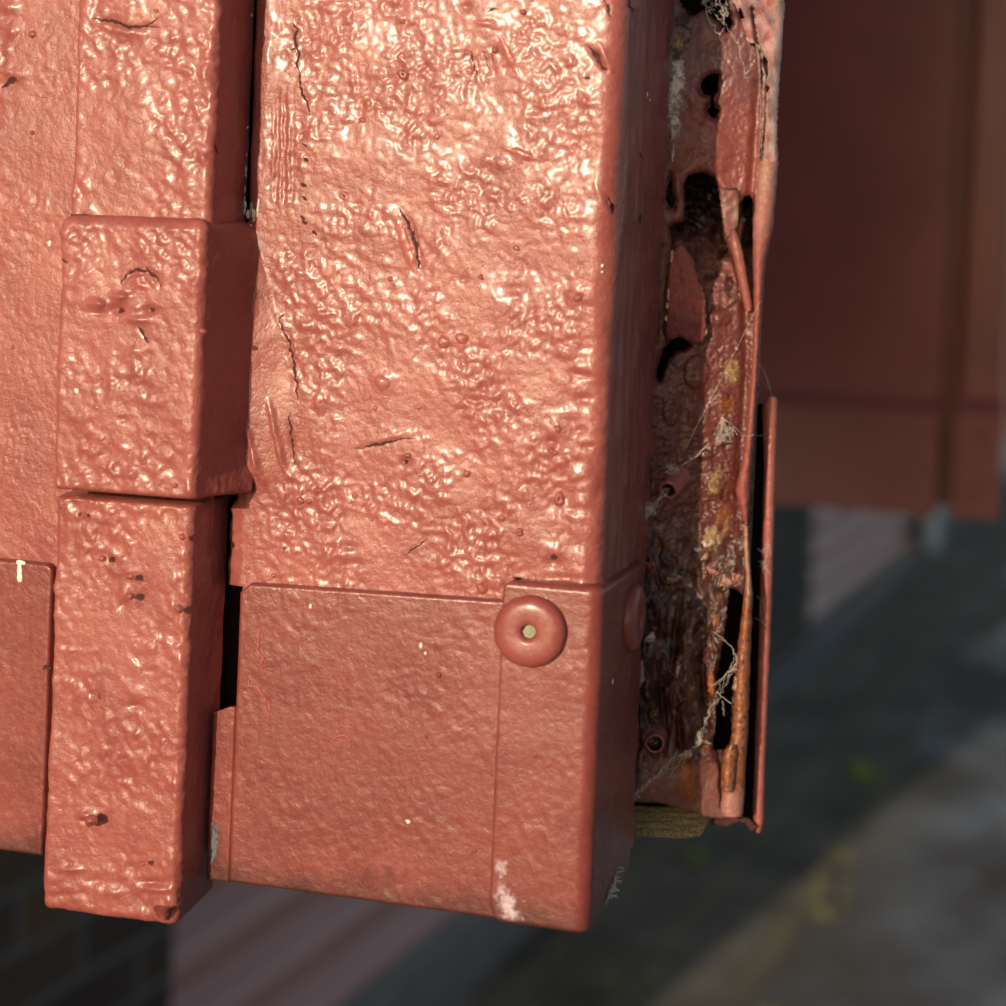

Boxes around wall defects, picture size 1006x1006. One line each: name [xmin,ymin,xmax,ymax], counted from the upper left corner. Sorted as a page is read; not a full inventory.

crack [92,17,158,29]
crack [291,23,310,113]
peeling [732,0,785,161]
crack [398,207,421,268]
corrosion [666,172,754,311]
crack [120,265,161,288]
crack [278,314,298,464]
corrosion [724,361,740,382]
crack [356,437,411,449]
corrosion [694,503,741,588]
corrosion [701,642,715,696]
corrosion [721,744,739,792]